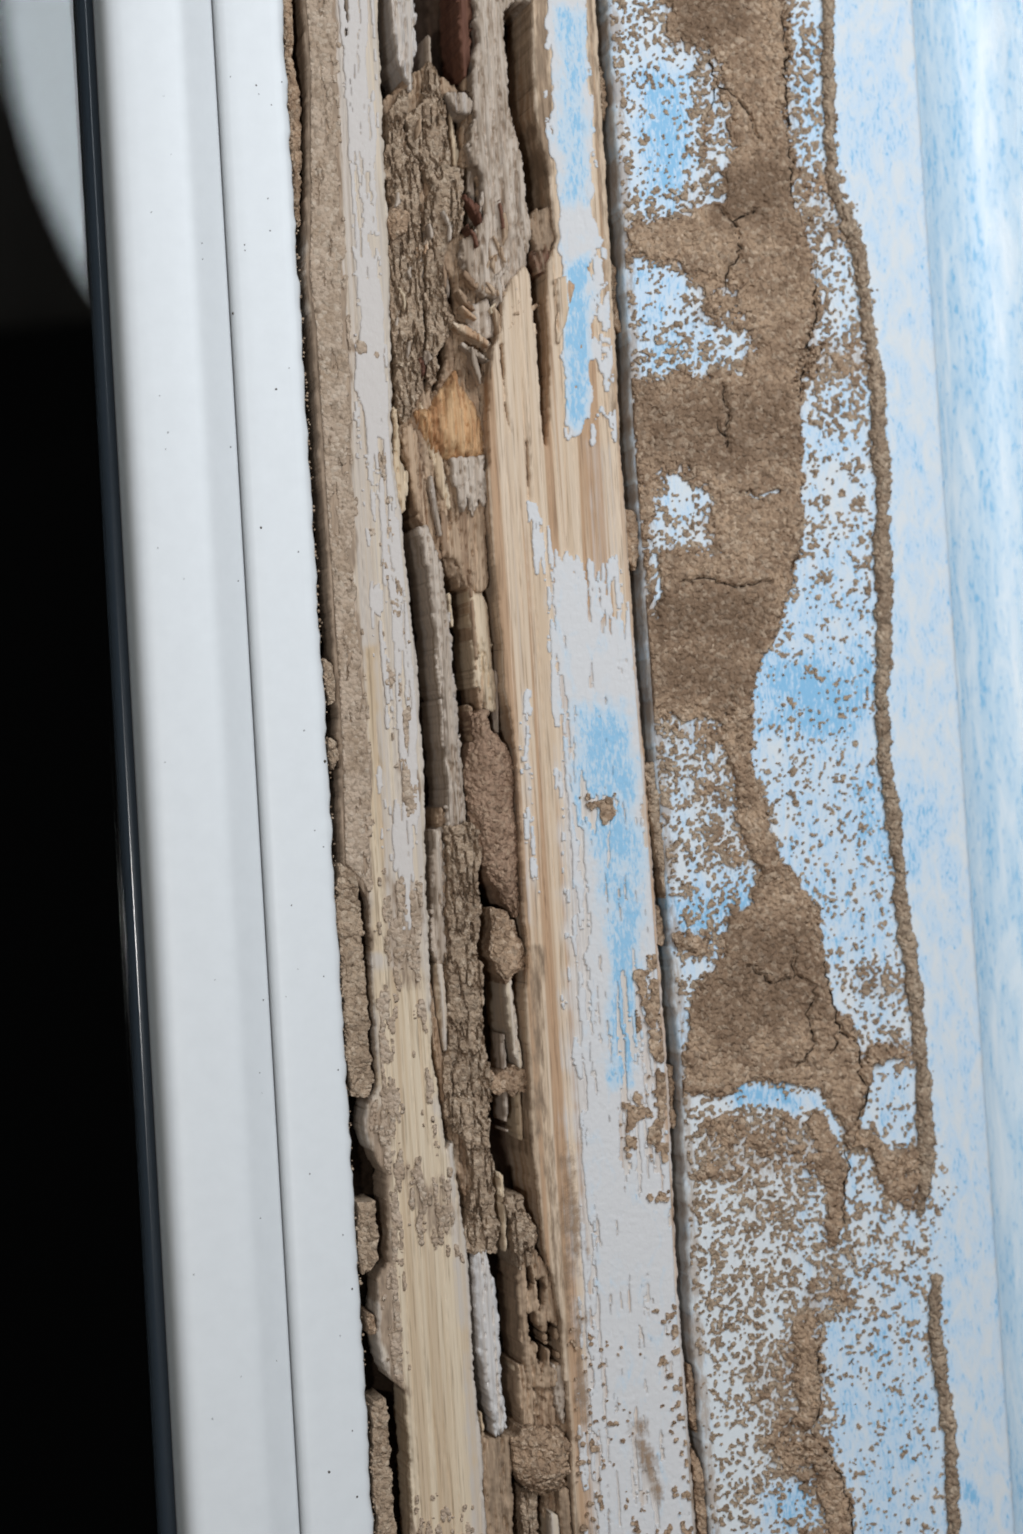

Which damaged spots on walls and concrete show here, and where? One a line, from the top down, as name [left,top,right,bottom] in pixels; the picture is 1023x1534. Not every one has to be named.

peeling [543,0,617,447]
peeling [338,0,465,930]
peeling [519,689,540,893]
spalling [439,822,538,1270]
peeling [526,500,694,1534]
spalling [511,1476,539,1534]